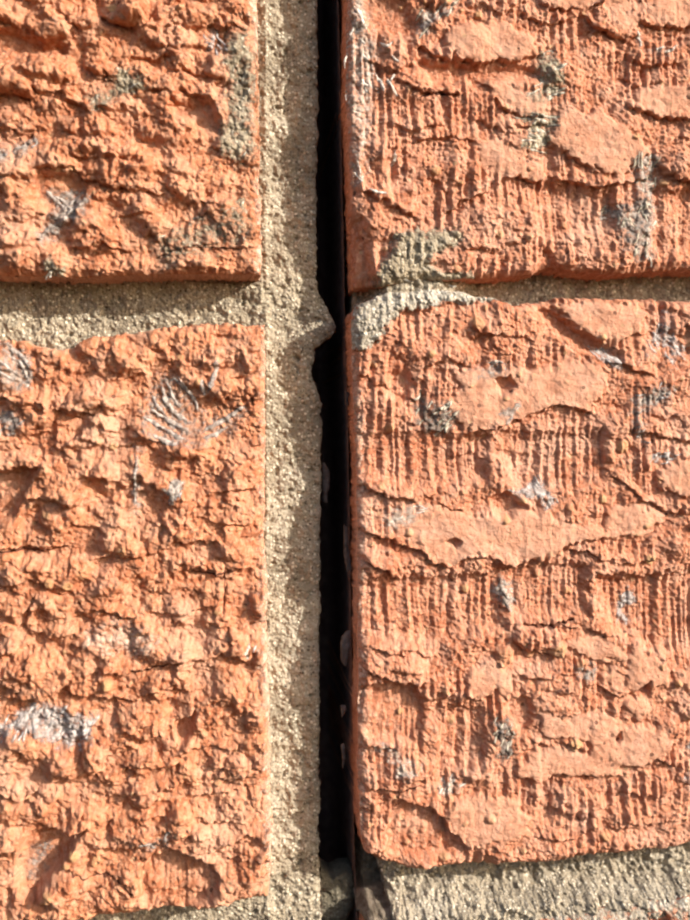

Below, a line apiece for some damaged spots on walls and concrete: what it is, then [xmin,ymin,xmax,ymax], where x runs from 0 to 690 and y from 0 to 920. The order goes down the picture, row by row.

crack [311,0,398,920]
crack [377,785,420,798]